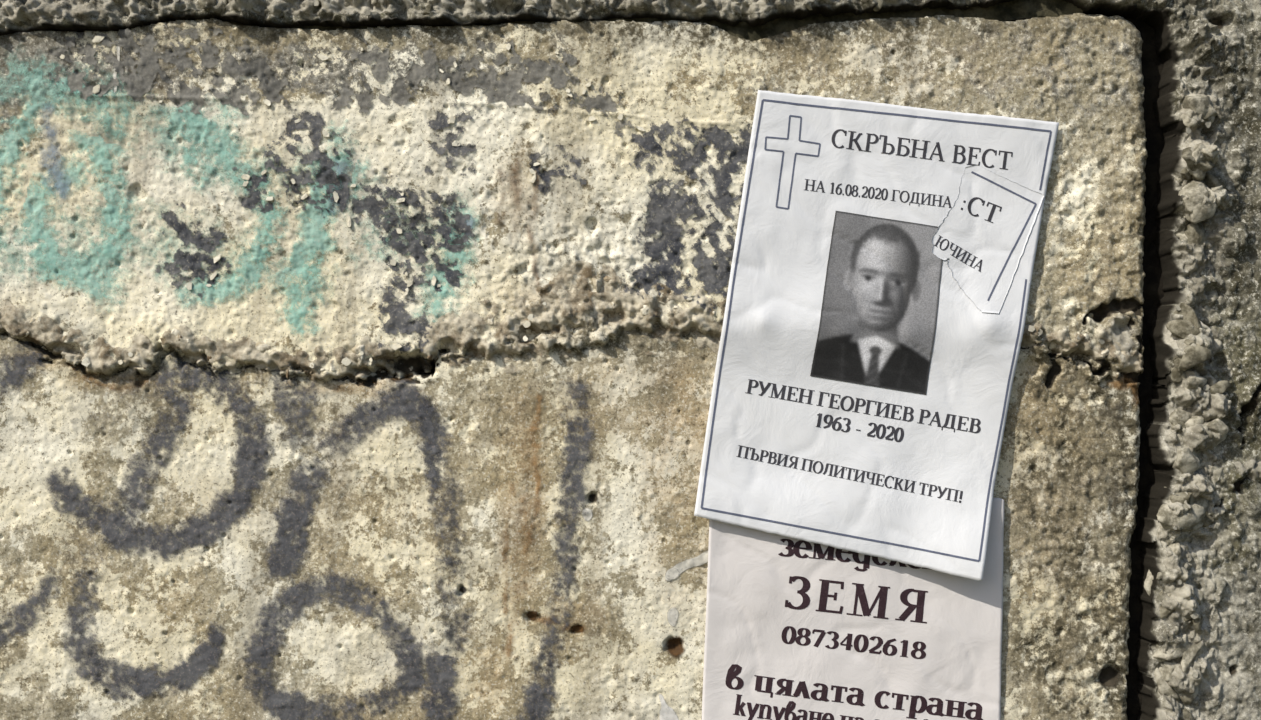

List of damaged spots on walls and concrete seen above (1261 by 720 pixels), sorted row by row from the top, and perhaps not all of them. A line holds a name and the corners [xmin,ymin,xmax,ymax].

crack [147,20,413,31]
crack [477,19,550,27]
crack [604,0,1083,42]
crack [2,332,458,389]
crack [1020,17,1165,720]